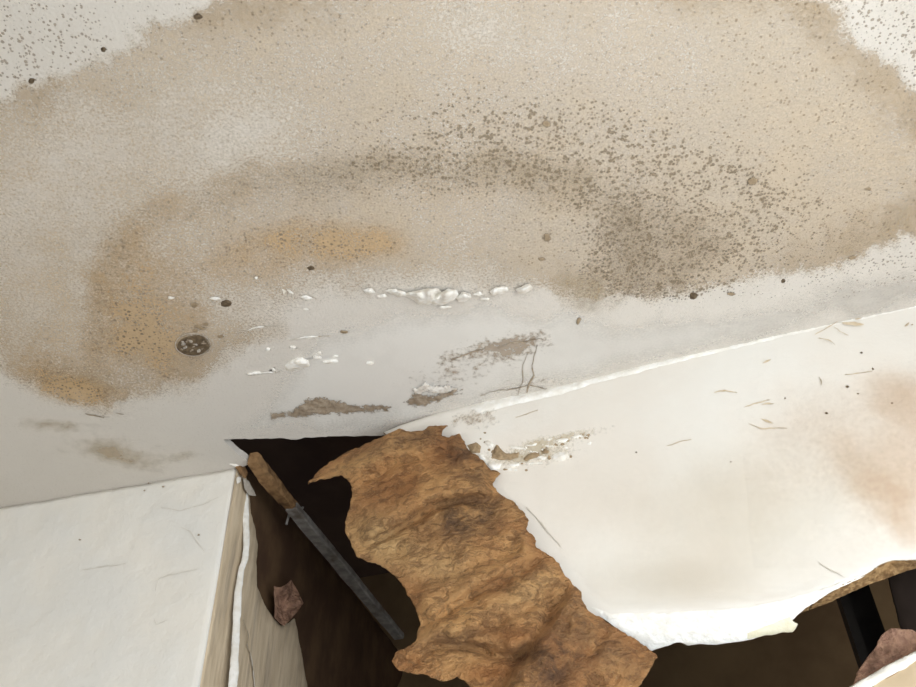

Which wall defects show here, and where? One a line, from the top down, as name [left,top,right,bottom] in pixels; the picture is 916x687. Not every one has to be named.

damp [0,0,916,408]
flaking render [406,382,463,407]
flaking render [271,397,391,421]
peeling [467,432,591,471]
flaking render [230,464,248,484]